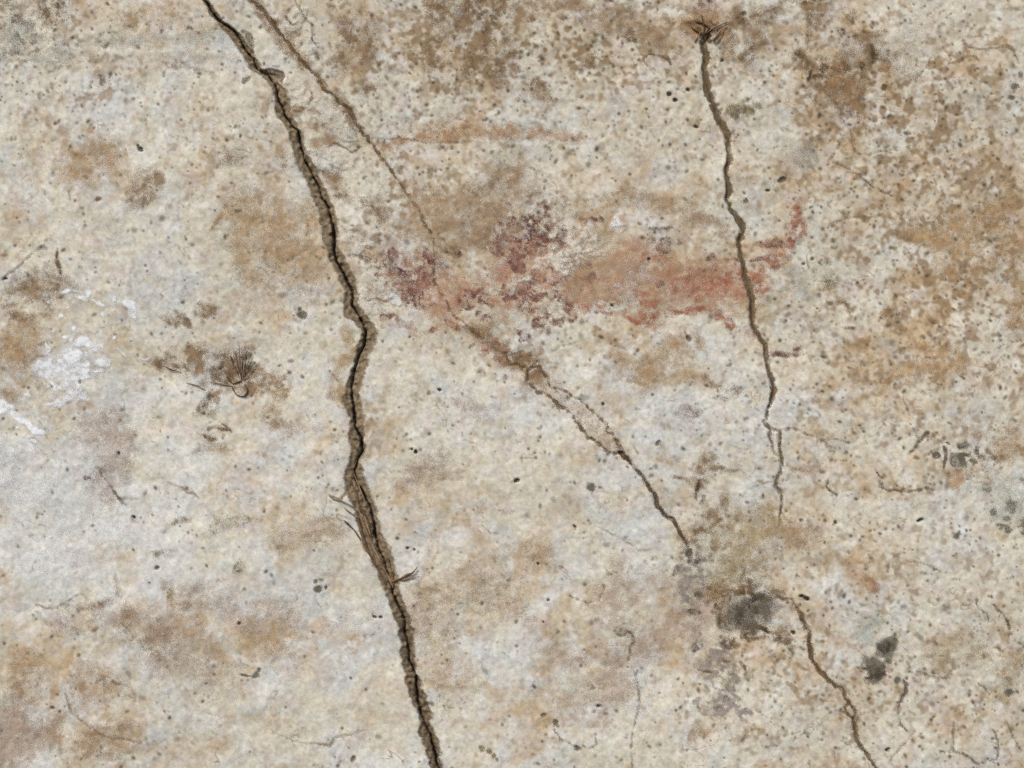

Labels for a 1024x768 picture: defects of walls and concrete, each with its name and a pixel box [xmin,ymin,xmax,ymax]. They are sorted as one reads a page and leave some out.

crack [202,0,706,768]
crack [698,33,846,525]
crack [775,596,960,768]